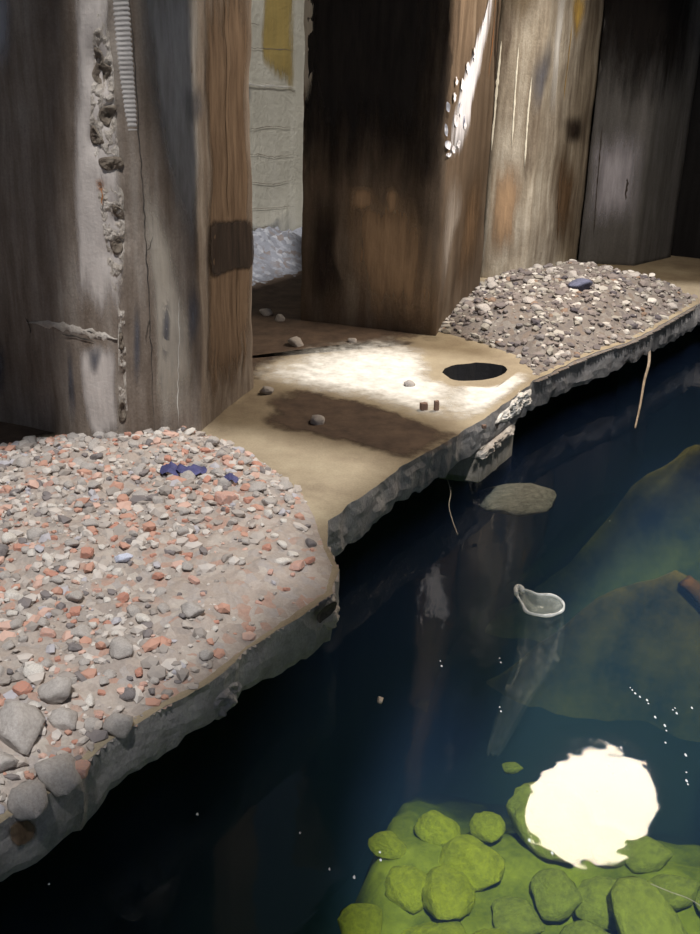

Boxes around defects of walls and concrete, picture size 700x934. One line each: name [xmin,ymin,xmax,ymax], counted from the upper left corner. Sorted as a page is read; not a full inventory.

spalling [89,13,124,171]
peeling [445,0,492,157]
spalling [98,185,128,422]
crack [129,0,155,429]